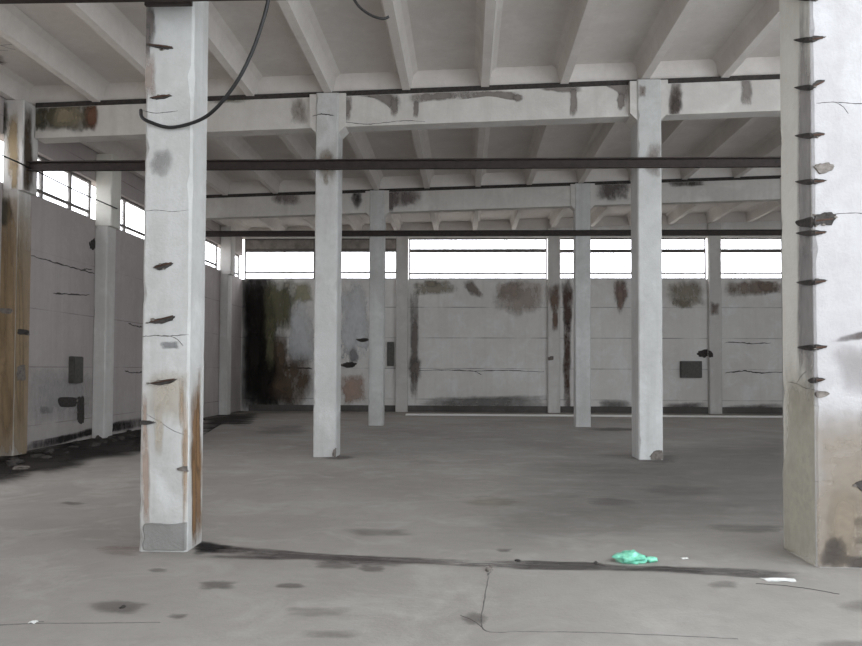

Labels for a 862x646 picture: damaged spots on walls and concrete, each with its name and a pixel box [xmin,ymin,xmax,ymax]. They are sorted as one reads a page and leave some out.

corrosion [86,106,97,127]
crack [31,255,95,274]
water stain [417,281,451,294]
water stain [500,283,538,312]
spalling [145,315,175,324]
water stain [203,279,311,432]
water stain [410,309,420,392]
crack [420,368,544,376]
crack [726,370,818,391]
corrosion [180,387,202,538]
water stain [817,431,862,568]